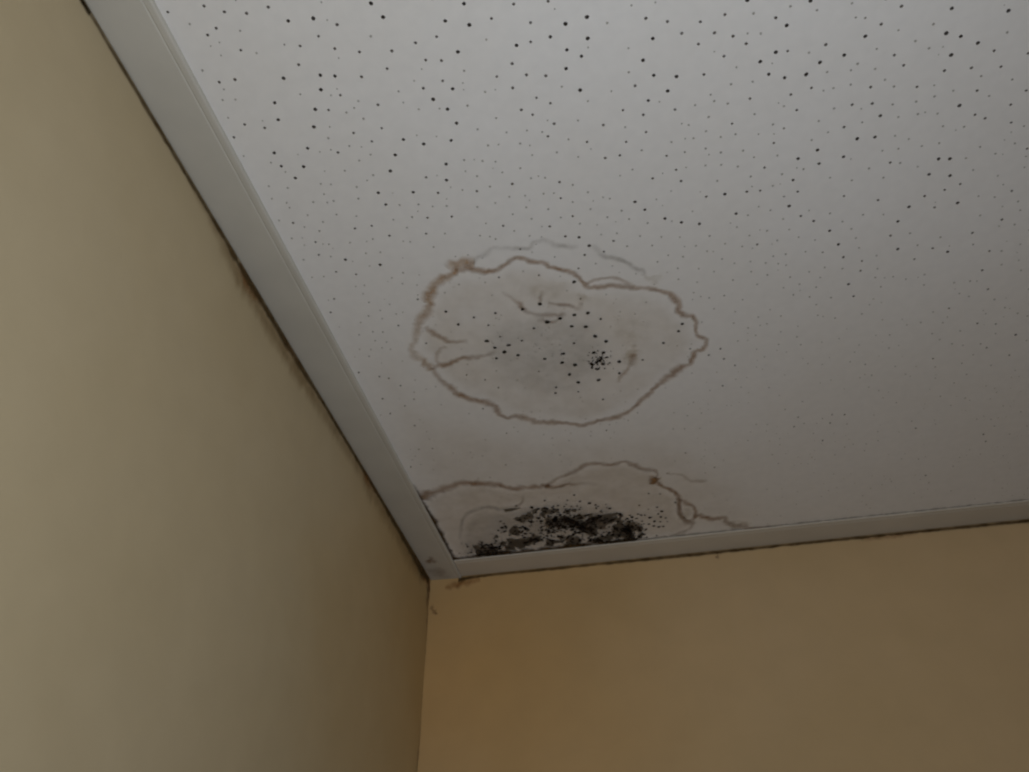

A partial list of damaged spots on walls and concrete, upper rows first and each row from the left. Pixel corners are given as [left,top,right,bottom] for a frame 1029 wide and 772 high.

damp [485,312,621,392]
damp [419,494,668,560]